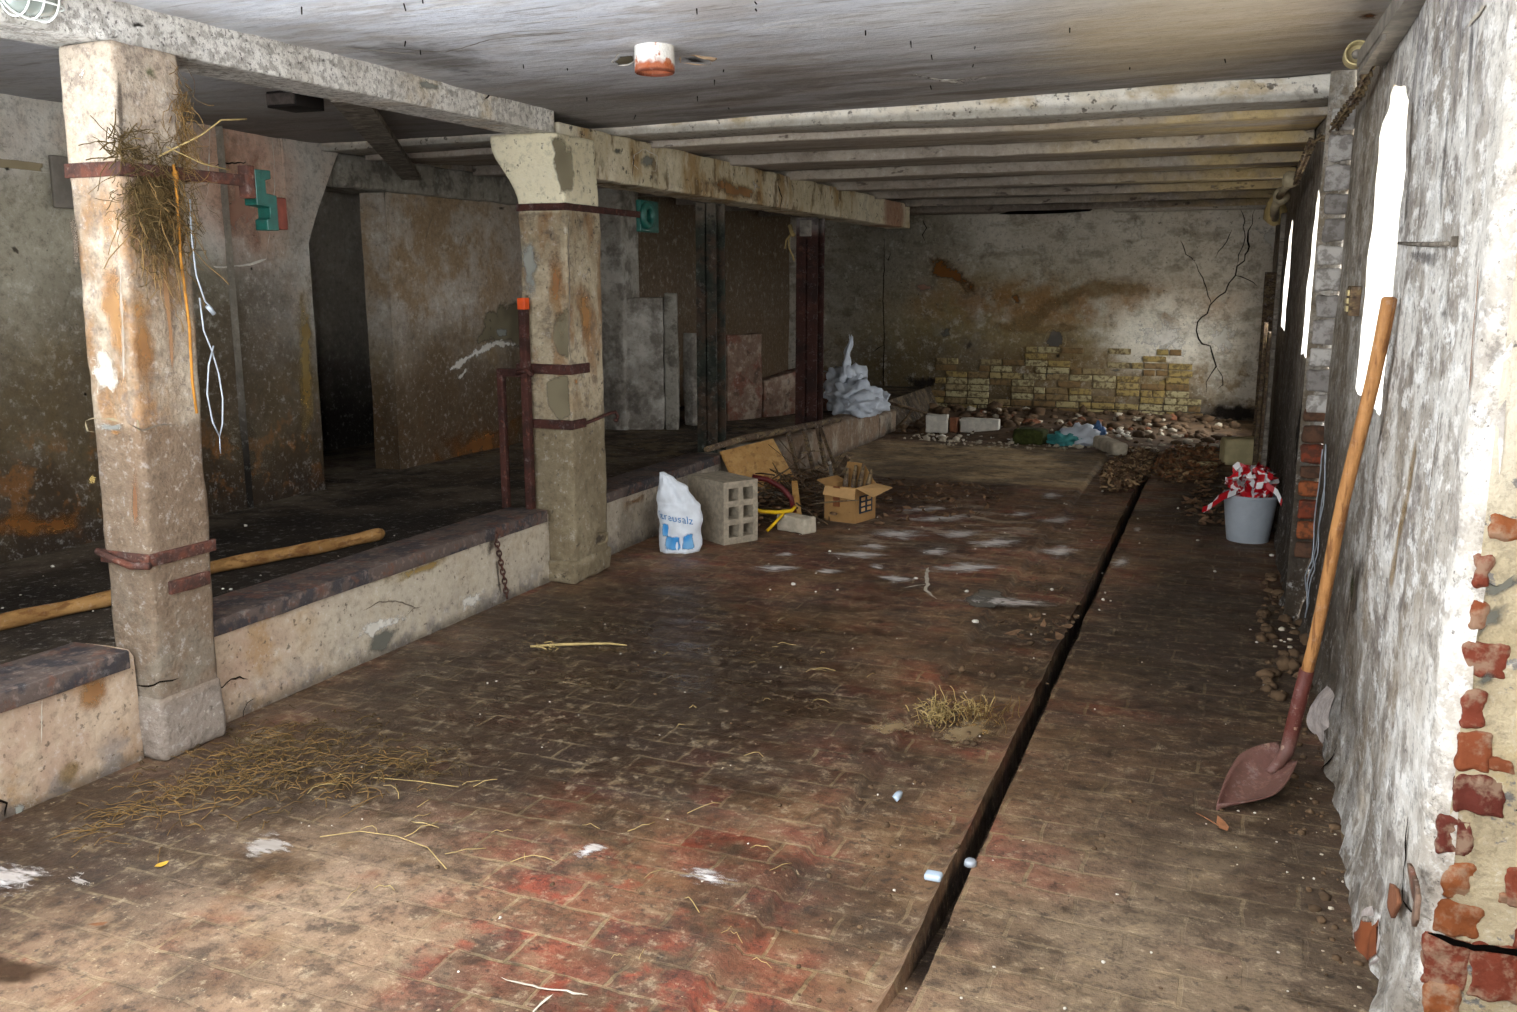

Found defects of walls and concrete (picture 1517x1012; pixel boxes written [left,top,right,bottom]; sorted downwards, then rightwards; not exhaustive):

leakage [930,258,974,292]
leakage [999,281,1148,334]
crack [1181,210,1257,391]
corrosion [0,515,76,535]
flaking render [1353,513,1517,1012]
crack [1402,819,1517,956]